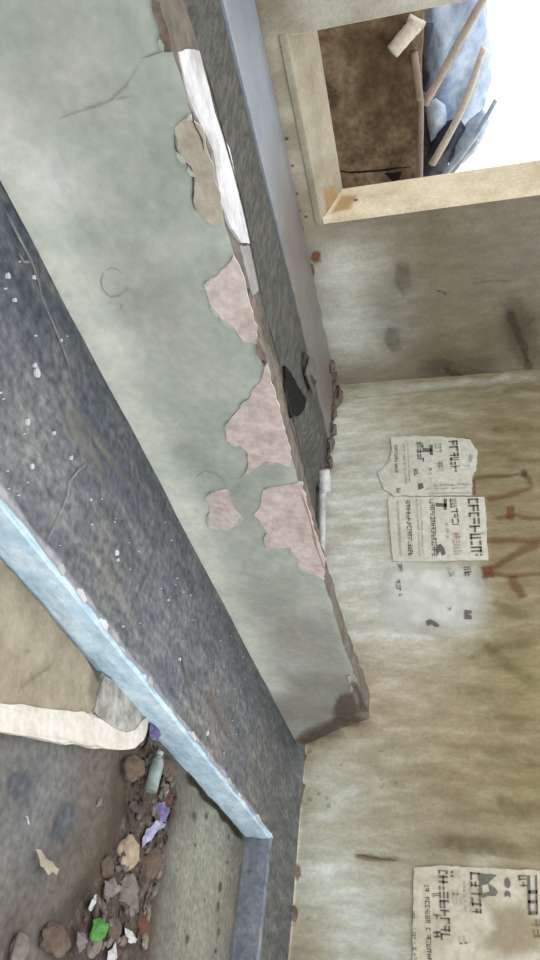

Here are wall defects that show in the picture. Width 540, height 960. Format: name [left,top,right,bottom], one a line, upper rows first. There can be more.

rust [327,190,358,210]
flaking render [152,0,306,476]
peeling [205,489,242,530]
peeling [254,481,326,580]
rust [473,470,536,520]
rust [482,538,540,597]
leakage [298,685,368,745]